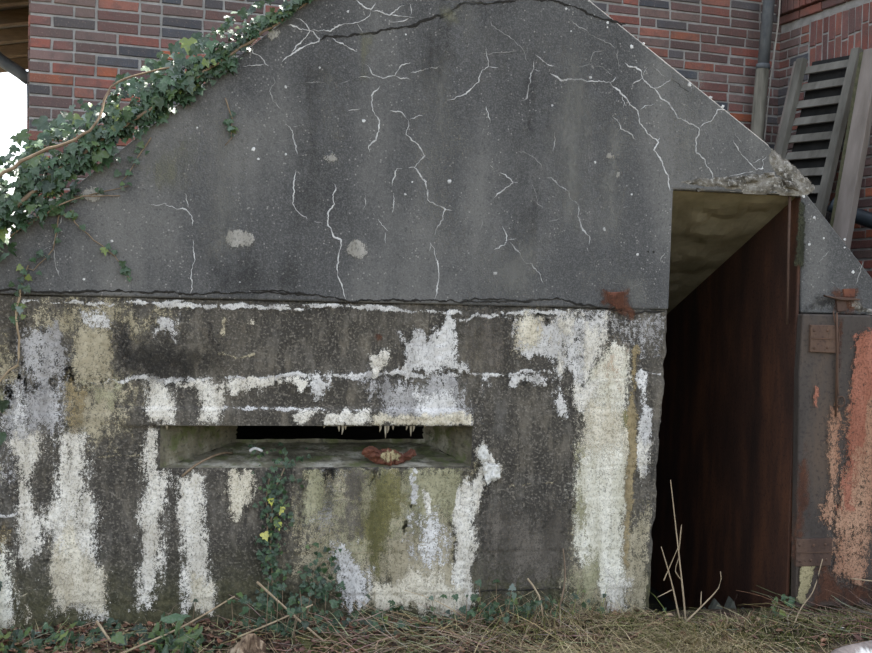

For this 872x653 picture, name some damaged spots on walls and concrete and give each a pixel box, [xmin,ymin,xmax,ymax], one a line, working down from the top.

crack [0,0,764,315]
spalling [680,149,815,197]
leakage [0,296,666,631]